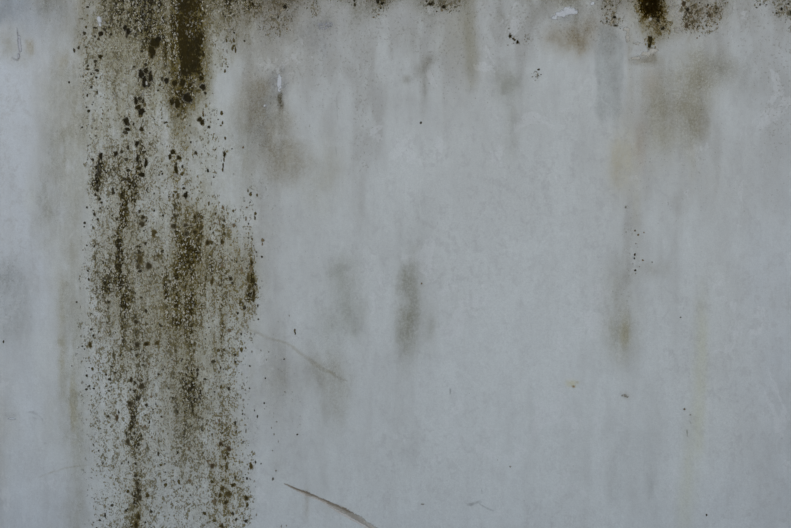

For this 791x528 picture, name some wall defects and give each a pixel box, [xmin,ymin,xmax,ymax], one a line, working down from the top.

leakage [420,0,462,14]
leakage [597,0,669,48]
leakage [676,0,729,39]
leakage [754,0,791,30]
leakage [71,0,292,528]
crack [284,483,377,528]